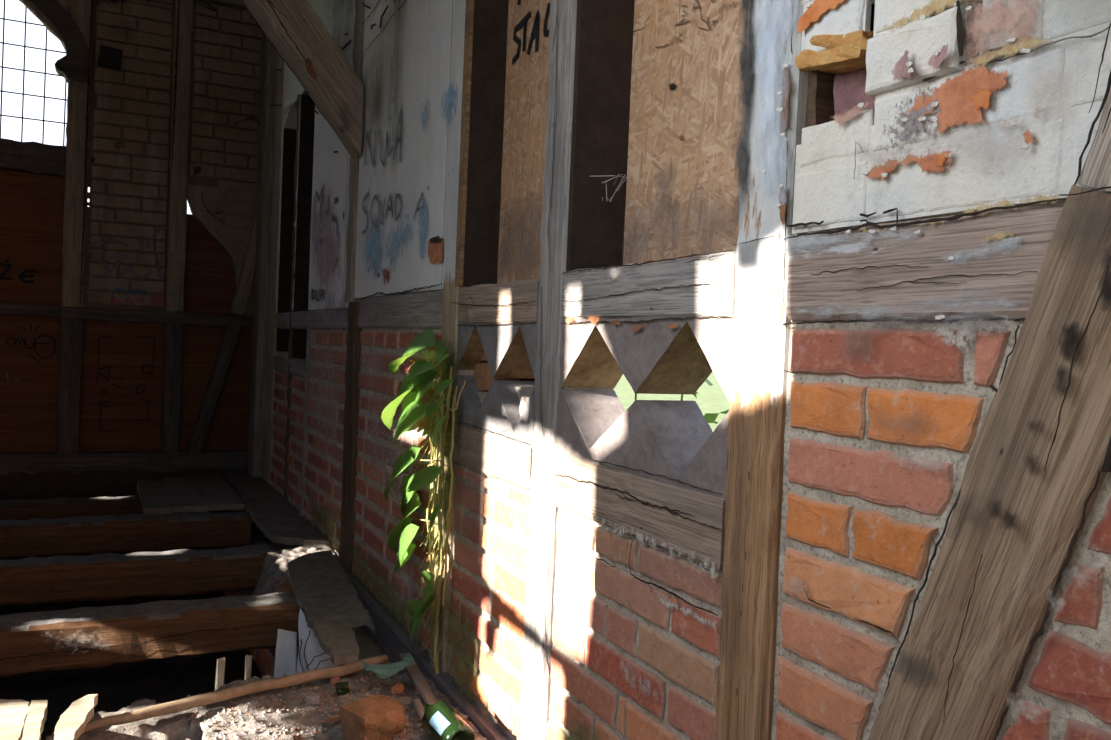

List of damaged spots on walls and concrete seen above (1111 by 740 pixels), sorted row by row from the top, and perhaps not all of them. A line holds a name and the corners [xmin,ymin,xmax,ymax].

crack [355,0,1111,385]
spalling [756,0,1060,252]
crack [454,365,722,593]
crack [590,521,718,616]
crack [804,489,961,712]
crack [943,554,983,722]
crack [1044,295,1101,471]